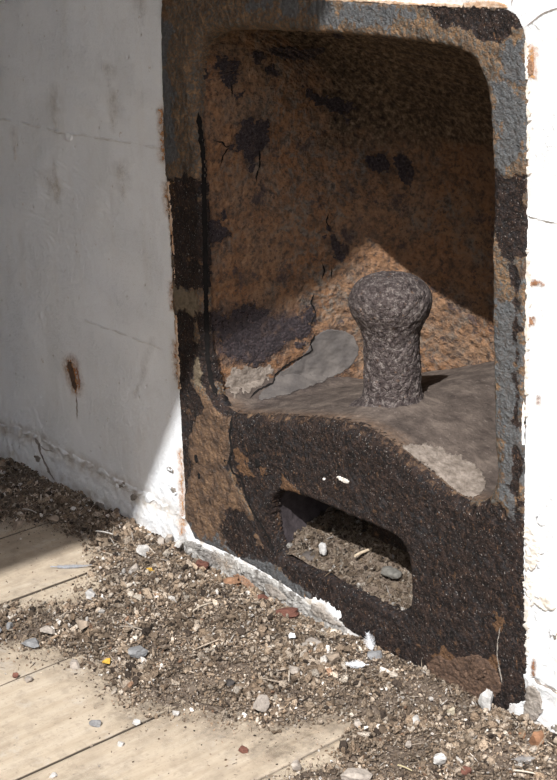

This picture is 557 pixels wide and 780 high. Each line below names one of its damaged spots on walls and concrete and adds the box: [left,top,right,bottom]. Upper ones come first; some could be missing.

rust [203,55,245,100]
rust [217,116,270,182]
rust [365,153,414,187]
rust [321,212,346,278]
rust [211,294,359,400]
rust [66,359,80,416]
rust [403,443,486,498]
rust [427,654,502,698]